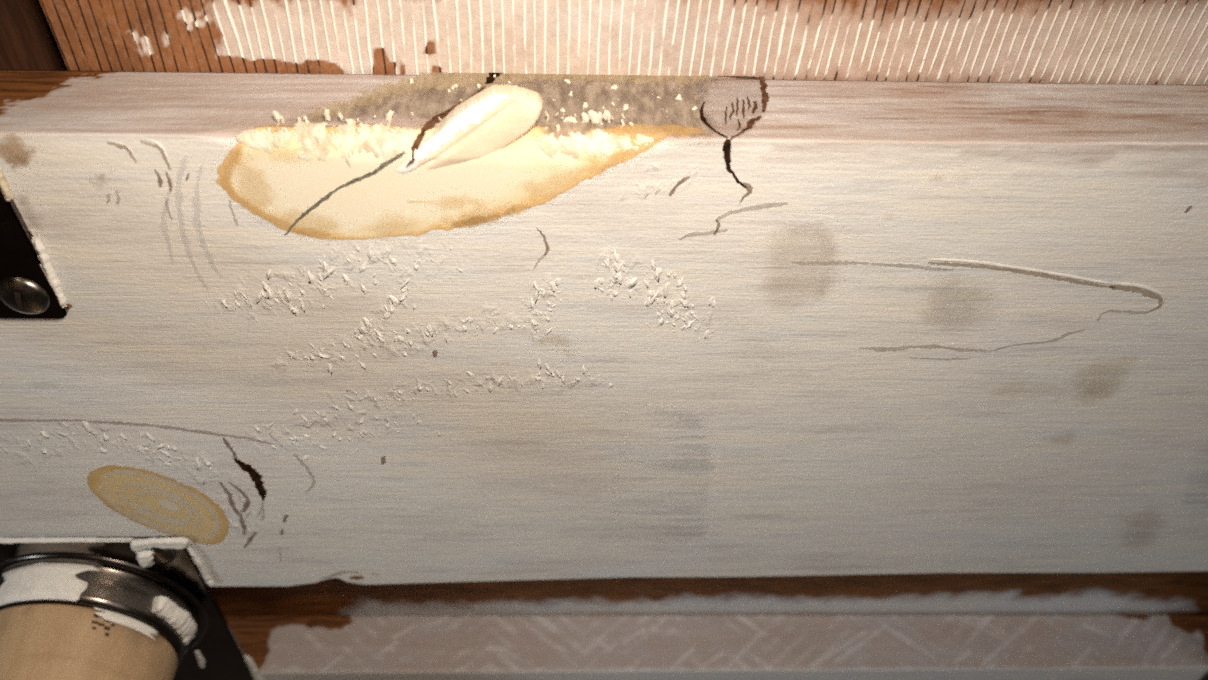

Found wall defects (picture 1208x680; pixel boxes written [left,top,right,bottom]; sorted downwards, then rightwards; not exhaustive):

peeling [235,108,427,168]
peeling [525,79,653,159]
crack [700,76,769,202]
crack [928,258,1166,312]
crack [219,438,288,548]